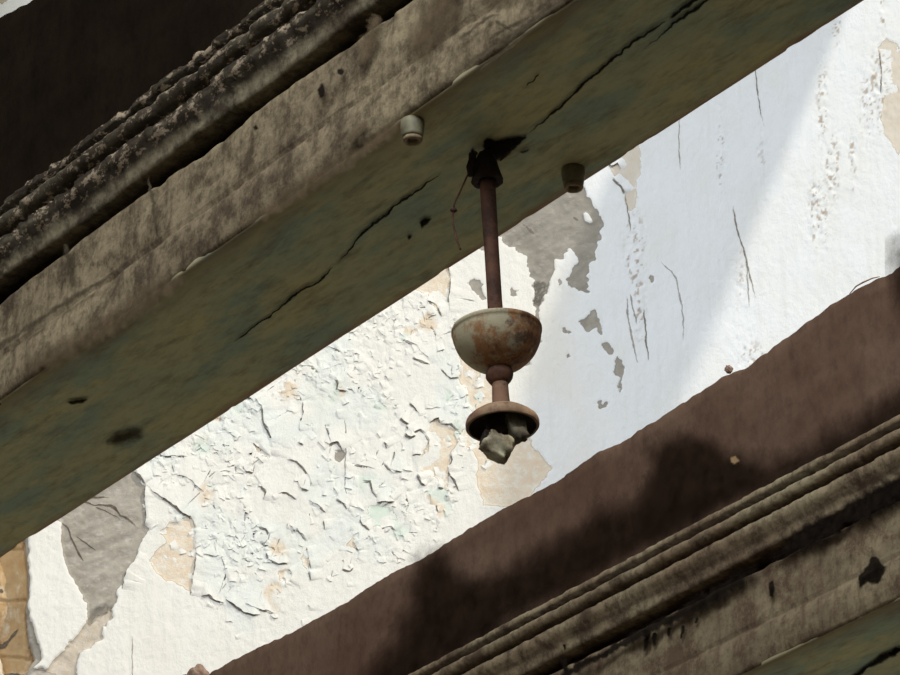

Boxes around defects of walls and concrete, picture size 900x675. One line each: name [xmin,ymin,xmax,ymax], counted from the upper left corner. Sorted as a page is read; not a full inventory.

crack [530,0,708,132]
peeling [878,39,900,154]
peeling [609,146,640,210]
crack [237,174,440,340]
spalling [500,187,604,320]
spalling [579,310,624,390]
peeling [27,264,552,675]
crack [855,647,900,675]